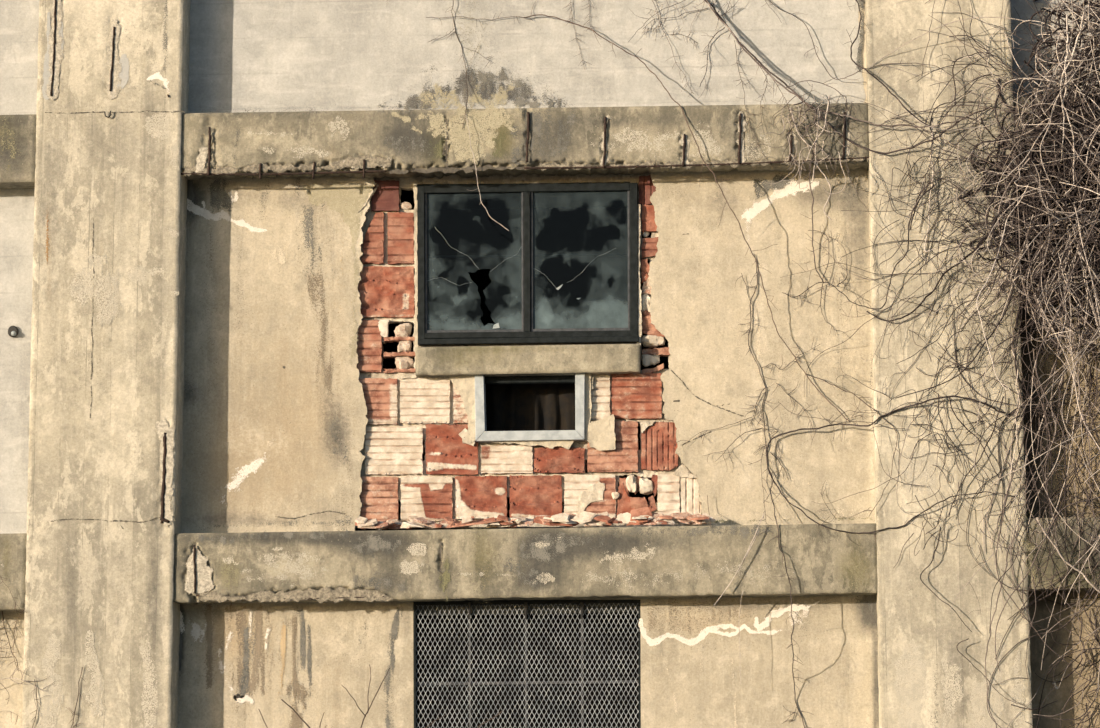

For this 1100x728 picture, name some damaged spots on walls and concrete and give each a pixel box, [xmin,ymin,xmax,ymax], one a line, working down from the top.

damp [375,0,578,169]
spalling [142,103,880,365]
crack [88,219,96,418]
damp [187,177,401,558]
flaking render [400,373,475,446]
flaking render [490,374,616,451]
crack [51,517,161,529]
spalling [183,545,394,604]
peeling [615,507,658,524]
damp [500,514,790,594]
damp [179,603,333,728]
damp [353,571,412,728]